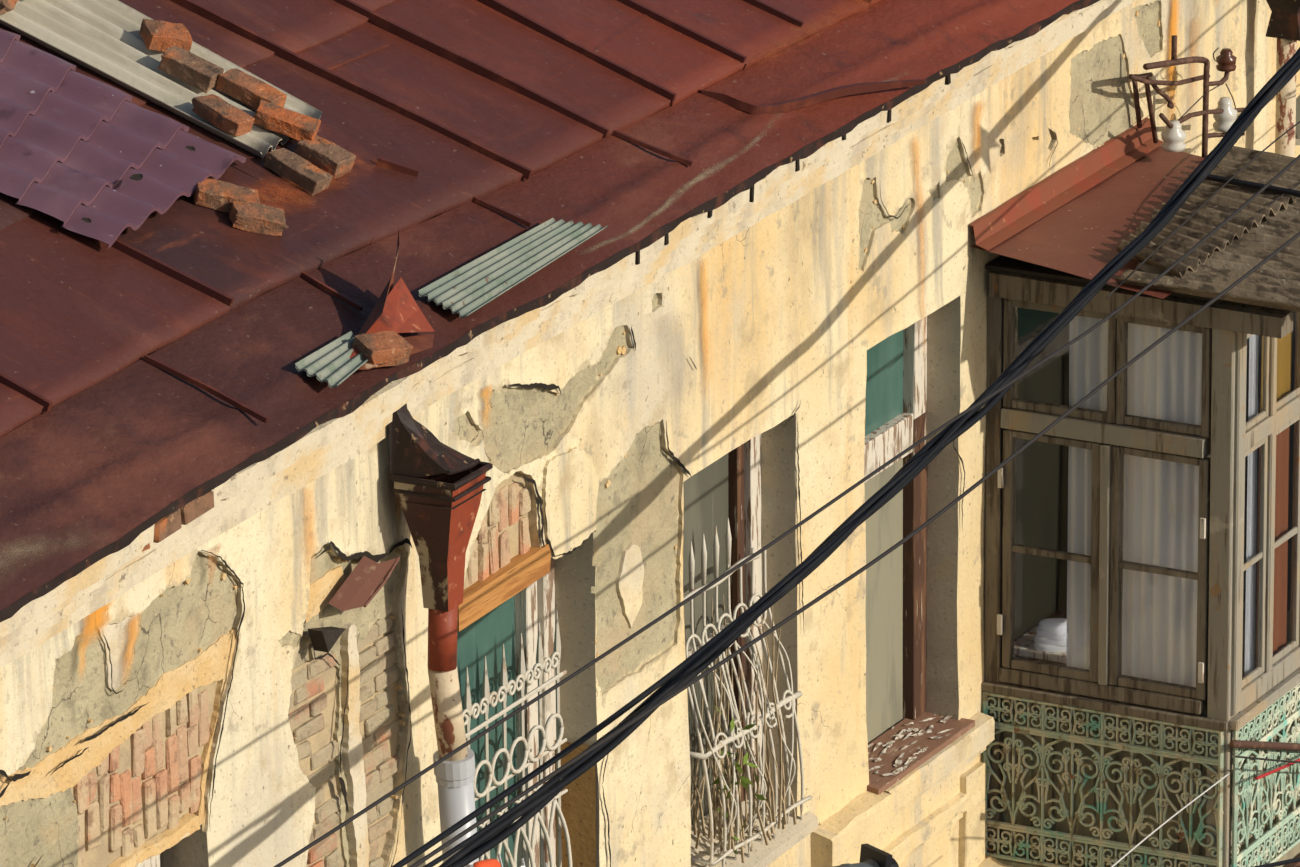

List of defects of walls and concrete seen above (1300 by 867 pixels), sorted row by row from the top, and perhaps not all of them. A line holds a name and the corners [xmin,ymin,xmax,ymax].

corrosion [1169,0,1179,102]
crack [880,191,910,219]
flaking render [454,325,629,585]
corrosion [80,603,110,667]
flaking render [18,553,237,771]
corrosion [127,618,138,663]
flaking render [73,679,210,867]
flaking render [278,545,406,867]
flaking render [591,421,680,693]